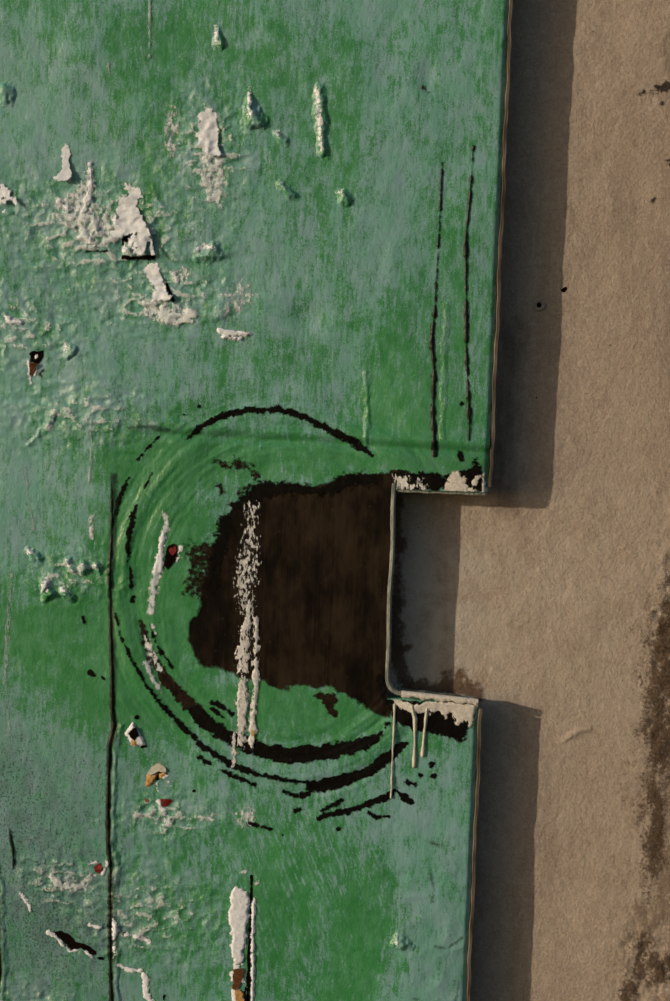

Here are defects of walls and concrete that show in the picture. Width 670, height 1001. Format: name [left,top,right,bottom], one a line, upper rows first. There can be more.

peeling [164,105,183,157]
peeling [195,107,227,209]
peeling [53,143,199,326]
peeling [217,327,251,341]
peeling [220,283,258,317]
peeling [142,454,487,743]
rust [390,496,483,701]
water stain [105,477,437,1001]
water stain [619,598,670,1001]
peeling [88,918,166,1001]
peeling [228,870,259,1001]